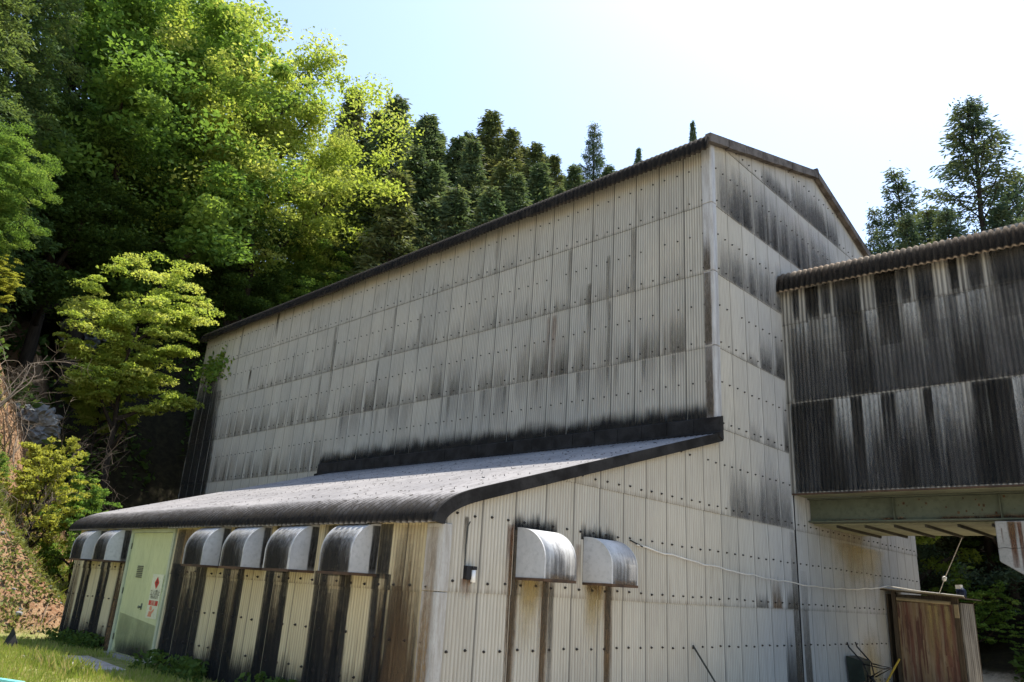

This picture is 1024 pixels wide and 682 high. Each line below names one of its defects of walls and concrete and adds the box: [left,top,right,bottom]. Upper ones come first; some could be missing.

leakage [721,192,815,269]
leakage [765,179,838,246]
leakage [319,285,714,464]
leakage [762,245,1024,491]
leakage [57,530,131,651]
leakage [156,525,351,682]
rust [943,497,1024,564]